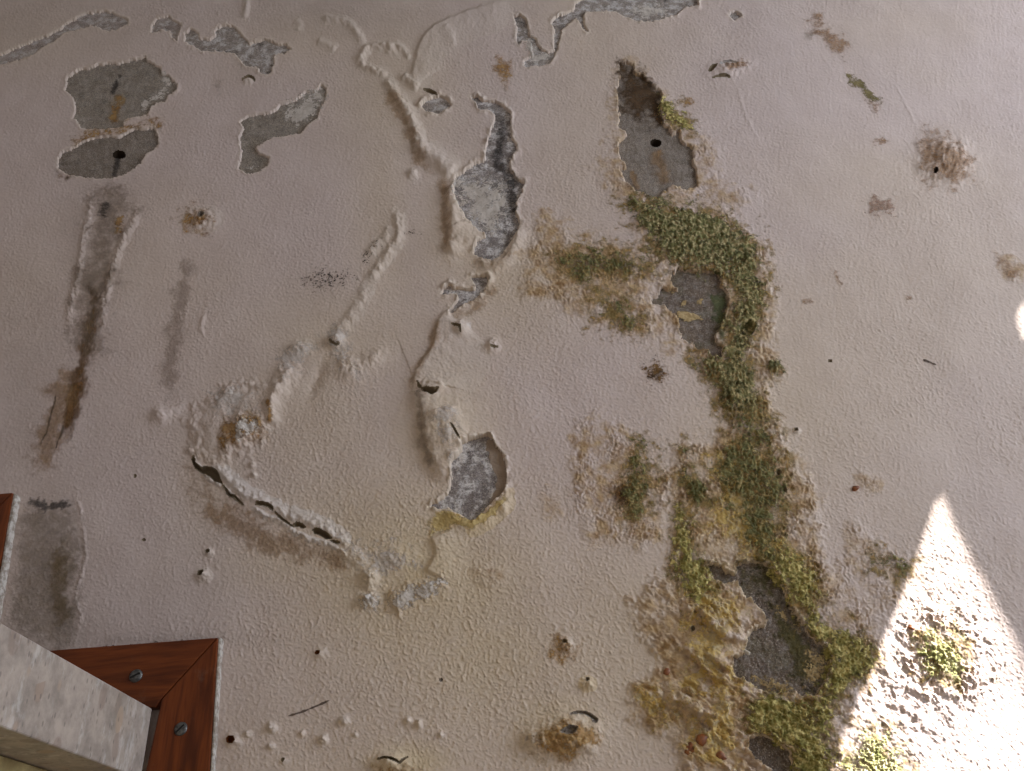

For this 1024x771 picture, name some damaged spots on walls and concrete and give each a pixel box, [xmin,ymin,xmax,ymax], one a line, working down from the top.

peeling [0,8,131,67]
peeling [149,13,293,78]
peeling [510,0,701,70]
peeling [55,53,179,180]
peeling [236,81,329,176]
water stain [920,133,973,190]
water stain [869,194,893,216]
water stain [39,289,99,463]
water stain [641,355,669,386]
peeling [427,49,1012,771]
crack [191,455,352,552]
water stain [539,719,600,762]